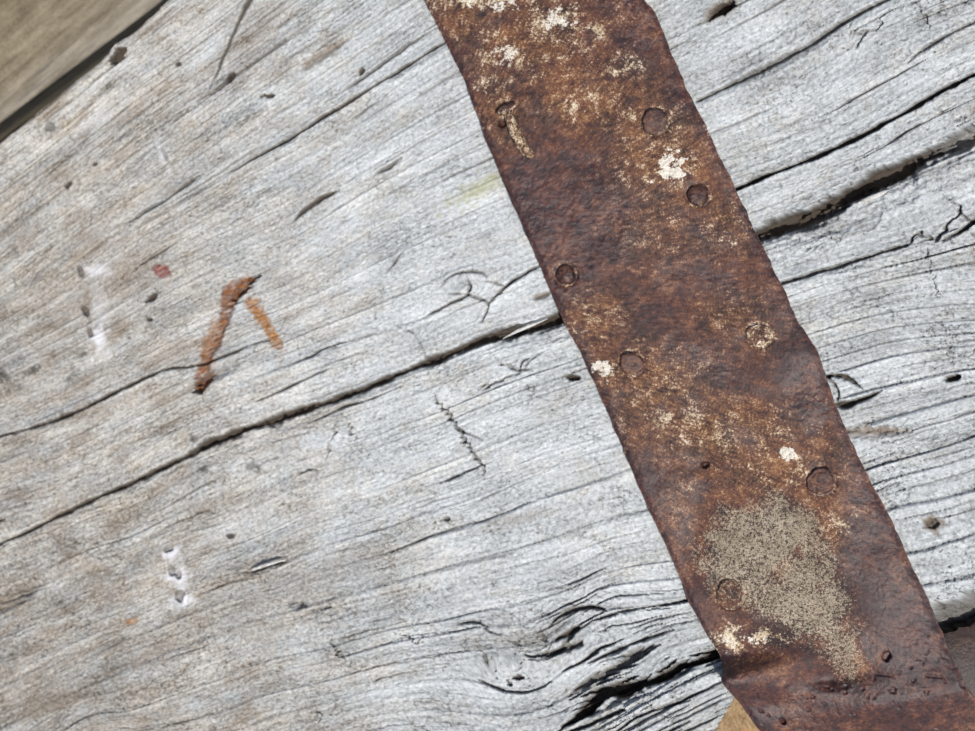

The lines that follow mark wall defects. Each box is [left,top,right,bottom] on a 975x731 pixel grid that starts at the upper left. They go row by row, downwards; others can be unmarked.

crack [195,0,313,102]
crack [734,70,975,298]
corrosion [190,271,296,397]
crack [0,263,572,548]
corrosion [401,479,641,549]
crack [236,559,289,577]
crack [303,604,355,668]
crack [398,630,427,645]
crack [449,618,504,636]
crack [476,596,723,731]
crack [307,697,324,724]